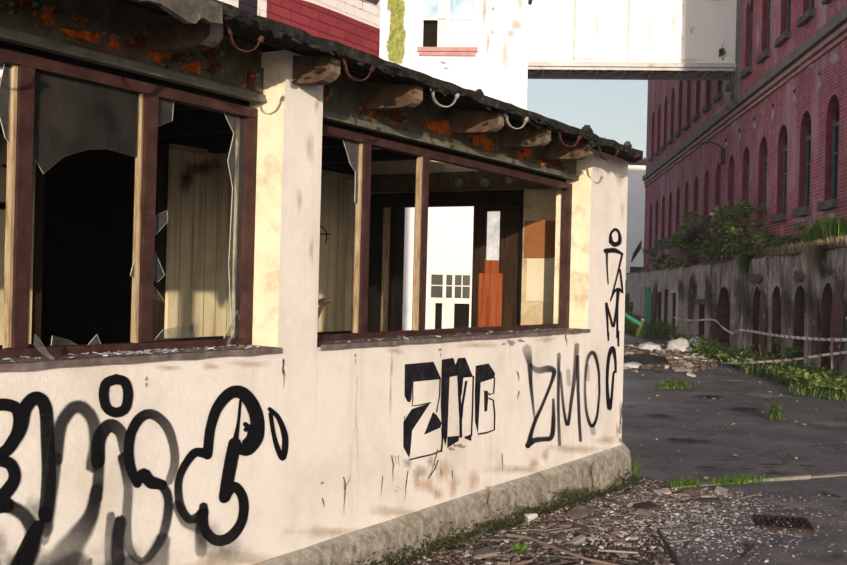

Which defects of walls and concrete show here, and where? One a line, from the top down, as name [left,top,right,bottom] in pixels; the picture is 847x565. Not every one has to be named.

rust [32,4,227,76]
rust [358,106,456,136]
rust [466,134,498,153]
rust [516,148,567,171]
flaking render [827,266,845,373]